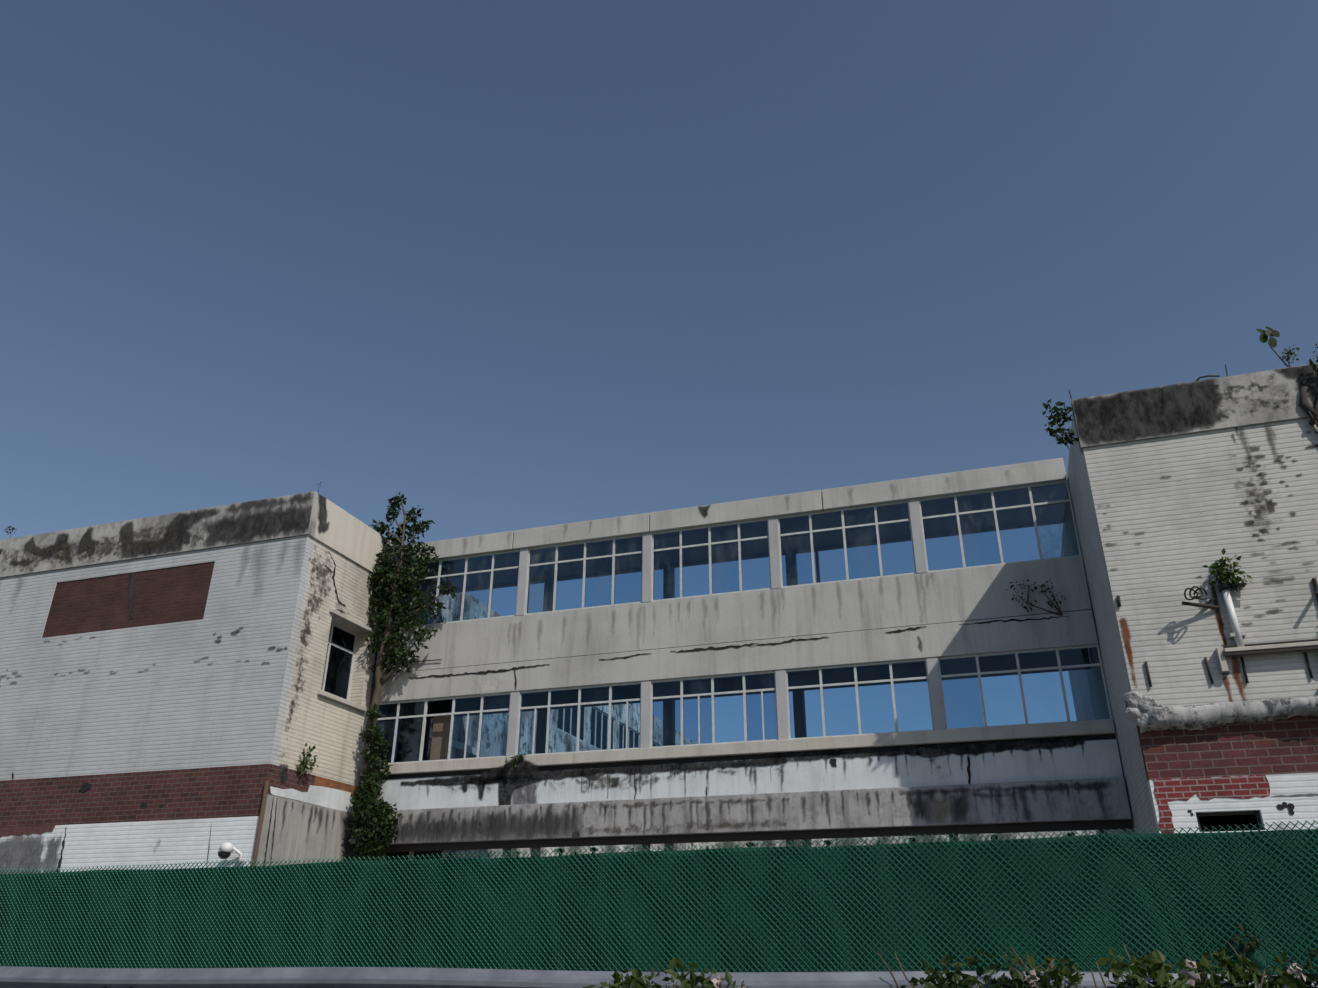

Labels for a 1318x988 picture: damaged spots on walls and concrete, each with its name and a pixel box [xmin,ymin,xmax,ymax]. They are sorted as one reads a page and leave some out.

leakage [1072,377,1288,468]
leakage [0,492,329,616]
crack [409,664,549,689]
crack [599,637,829,660]
crack [885,625,927,633]
crack [959,616,1069,625]
rust [1120,618,1135,683]
rust [1215,609,1245,702]
leakage [471,715,480,747]
leakage [396,723,1106,858]